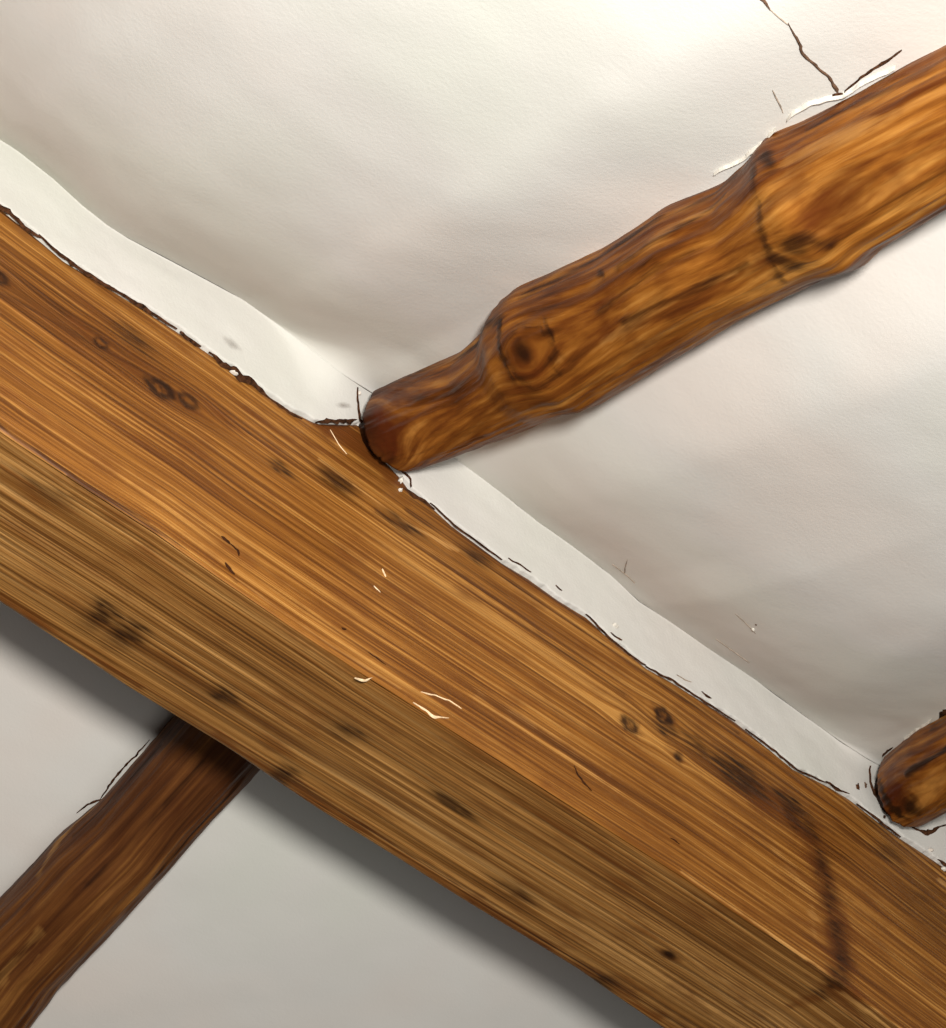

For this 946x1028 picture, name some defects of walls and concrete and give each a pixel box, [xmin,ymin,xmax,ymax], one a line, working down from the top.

crack [714,0,902,175]
crack [0,204,363,425]
crack [396,469,531,572]
crack [585,614,946,872]